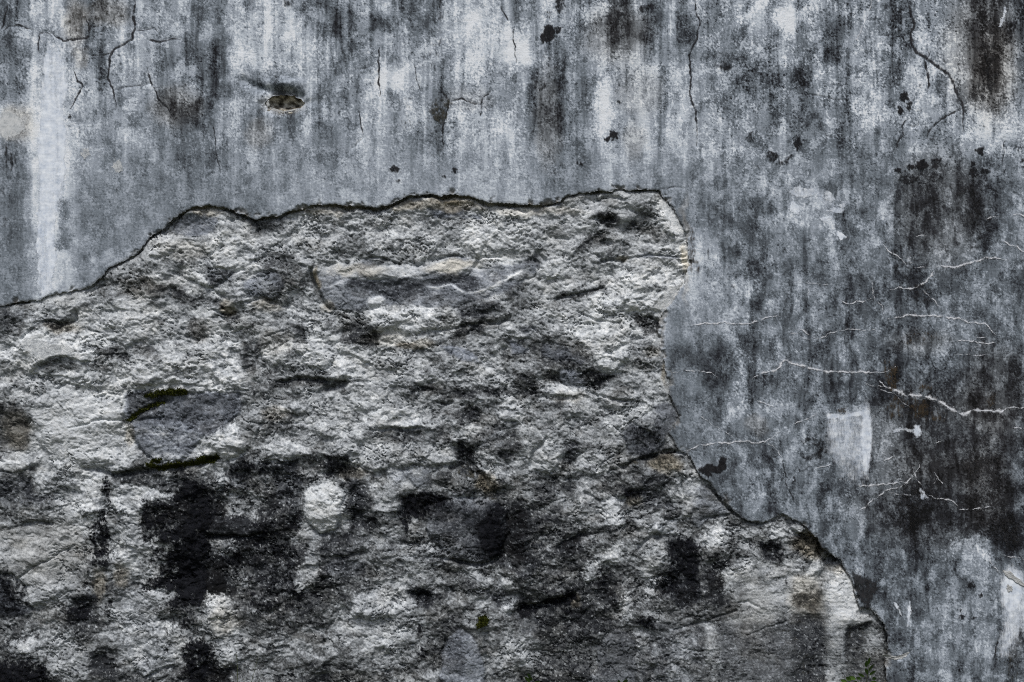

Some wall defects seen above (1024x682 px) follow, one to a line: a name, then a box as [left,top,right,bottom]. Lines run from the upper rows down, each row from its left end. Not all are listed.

crack [1,4,177,115]
spalling [265,95,305,114]
leakage [539,0,566,90]
crack [688,3,701,145]
mould [898,90,912,117]
crack [896,0,965,146]
leakage [0,46,71,298]
leakage [894,147,993,263]
crack [801,241,1024,356]
flaking render [0,189,909,682]
crack [755,360,1024,429]
leakage [136,456,348,682]